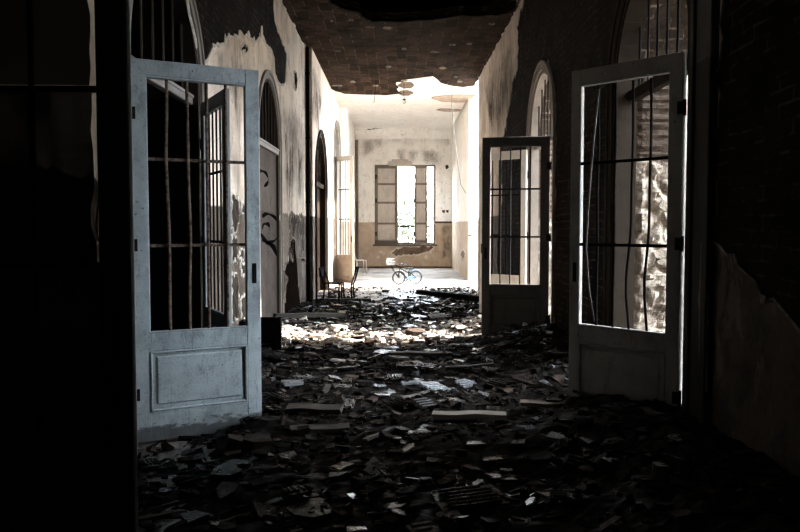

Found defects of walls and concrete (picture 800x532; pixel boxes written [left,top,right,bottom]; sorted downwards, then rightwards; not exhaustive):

flaking render [186,0,617,333]
flaking render [713,0,800,335]